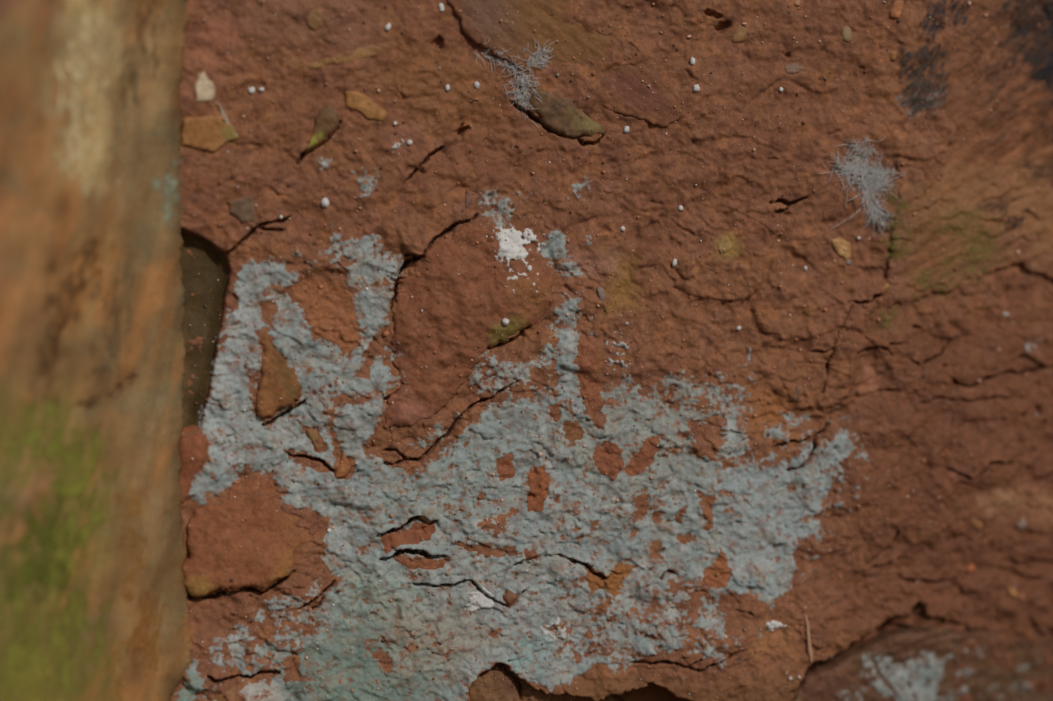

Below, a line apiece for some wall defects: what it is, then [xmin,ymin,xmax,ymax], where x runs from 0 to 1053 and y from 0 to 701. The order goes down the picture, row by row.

water stain [898,0,977,115]
crack [390,214,478,309]
spalling [288,278,360,356]
crack [811,290,899,394]
crack [919,355,1053,403]
crack [383,380,518,465]
spalling [592,435,660,481]
crack [775,422,831,471]
spalling [527,466,551,512]
spalling [381,516,447,570]
spalling [587,563,633,595]
spalling [703,548,731,589]